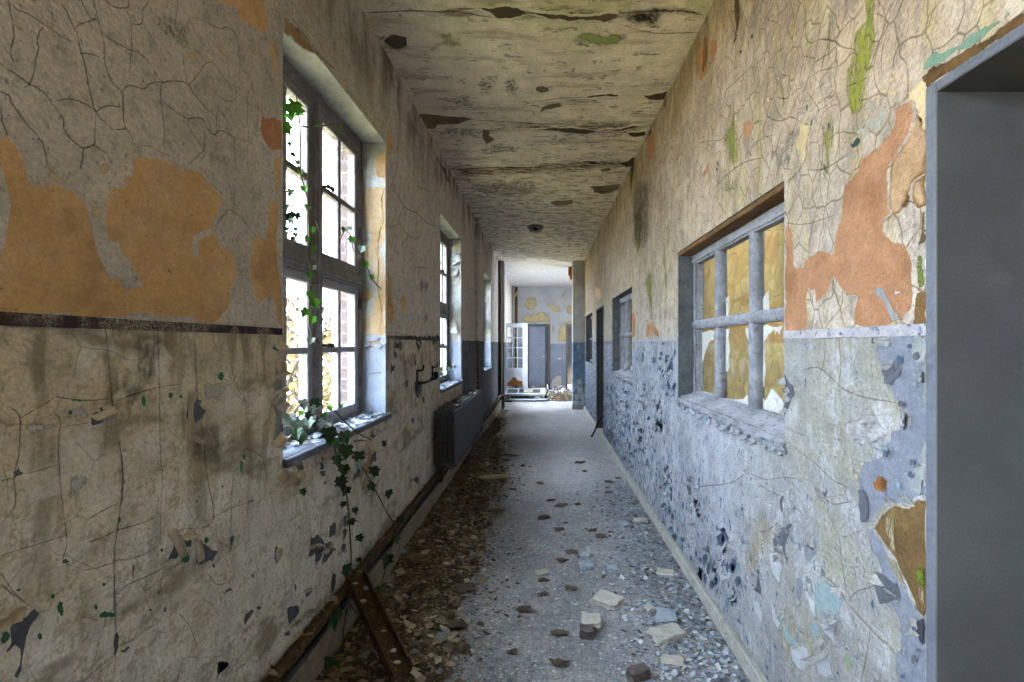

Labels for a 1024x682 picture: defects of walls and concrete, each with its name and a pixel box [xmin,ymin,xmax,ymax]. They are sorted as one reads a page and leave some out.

crack [0,0,265,225]
spalling [418,98,518,153]
spalling [475,3,622,24]
spalling [515,123,655,195]
crack [699,3,901,237]
spalling [0,111,293,448]
crack [805,341,895,403]
spalling [782,65,927,682]
peeling [0,605,41,682]
crack [1,329,268,677]
peeling [307,514,348,596]
crack [710,430,887,671]